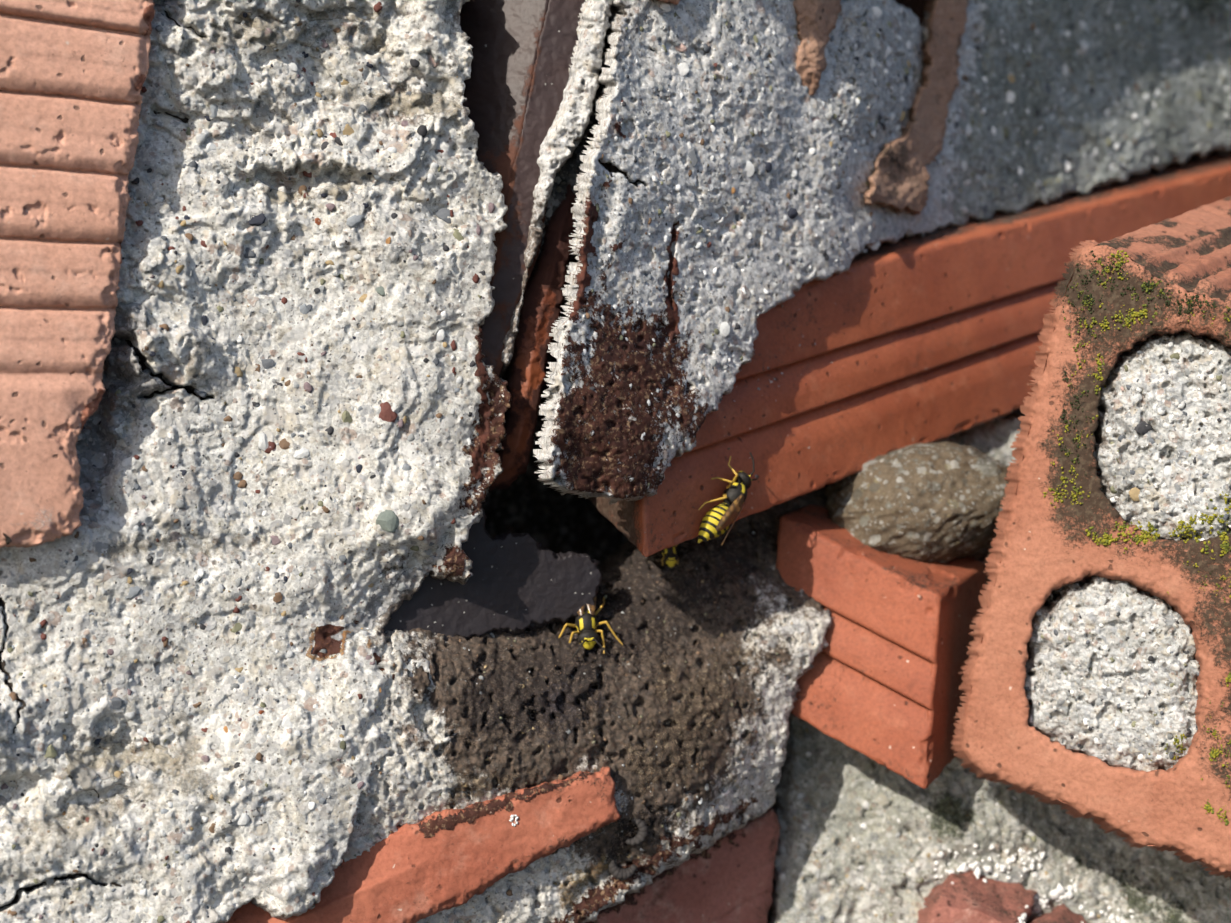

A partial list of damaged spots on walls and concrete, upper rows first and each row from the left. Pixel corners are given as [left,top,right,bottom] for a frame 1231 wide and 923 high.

crack [533,16,645,270]
crack [125,340,214,400]
crack [0,597,26,734]
damp [433,504,799,797]
damp [429,763,535,814]
crack [0,873,121,908]
damp [559,857,609,908]